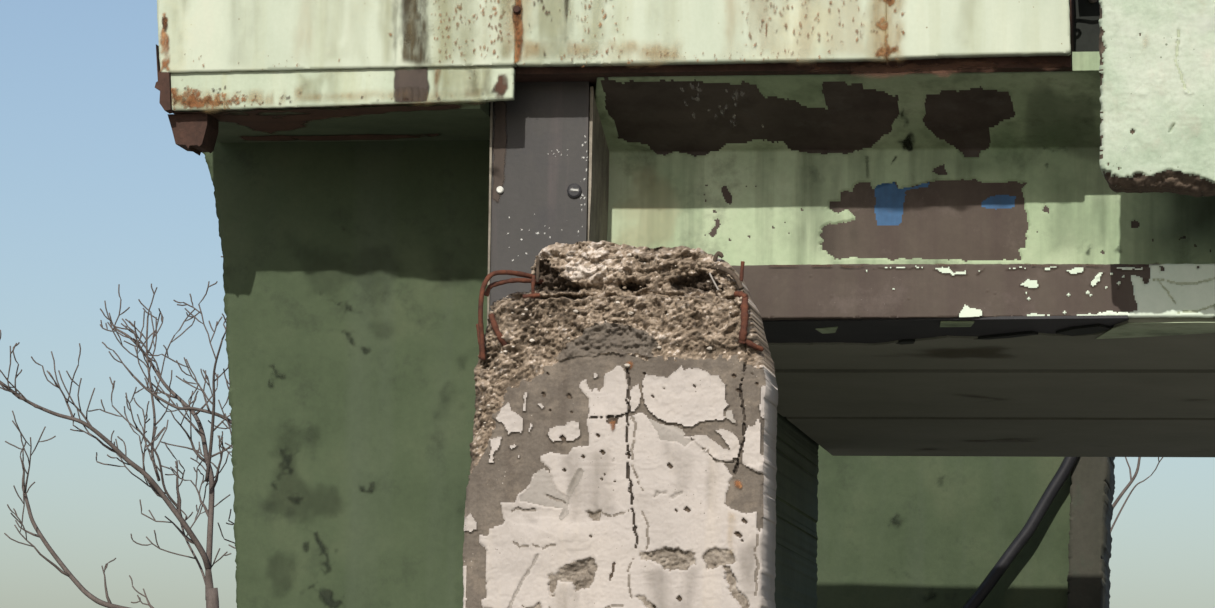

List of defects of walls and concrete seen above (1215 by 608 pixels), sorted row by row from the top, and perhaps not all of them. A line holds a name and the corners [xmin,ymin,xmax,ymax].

water stain [394,0,429,102]
rust [431,0,571,82]
rust [742,0,1066,77]
rust [171,75,507,141]
peeling [601,77,900,157]
peeling [922,86,1015,157]
spalling [1100,112,1215,197]
crack [702,365,747,474]
spalling [463,164,1164,608]
crack [589,367,650,608]
water stain [319,589,341,608]